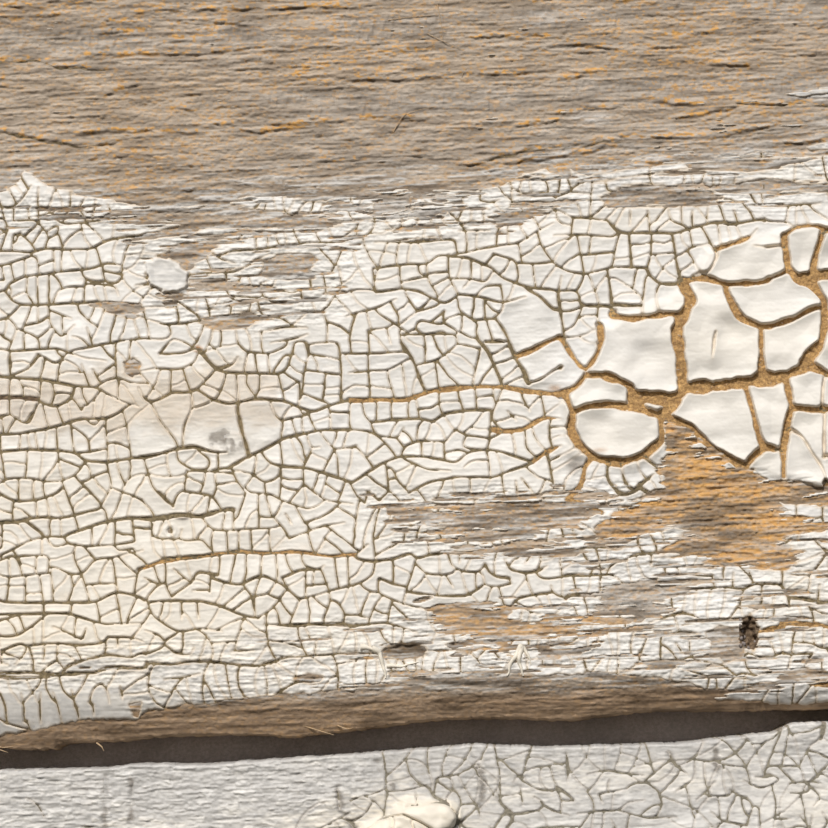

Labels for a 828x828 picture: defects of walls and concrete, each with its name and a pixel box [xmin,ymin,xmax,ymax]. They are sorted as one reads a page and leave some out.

peeling [0,0,828,571]
peeling [425,573,700,662]